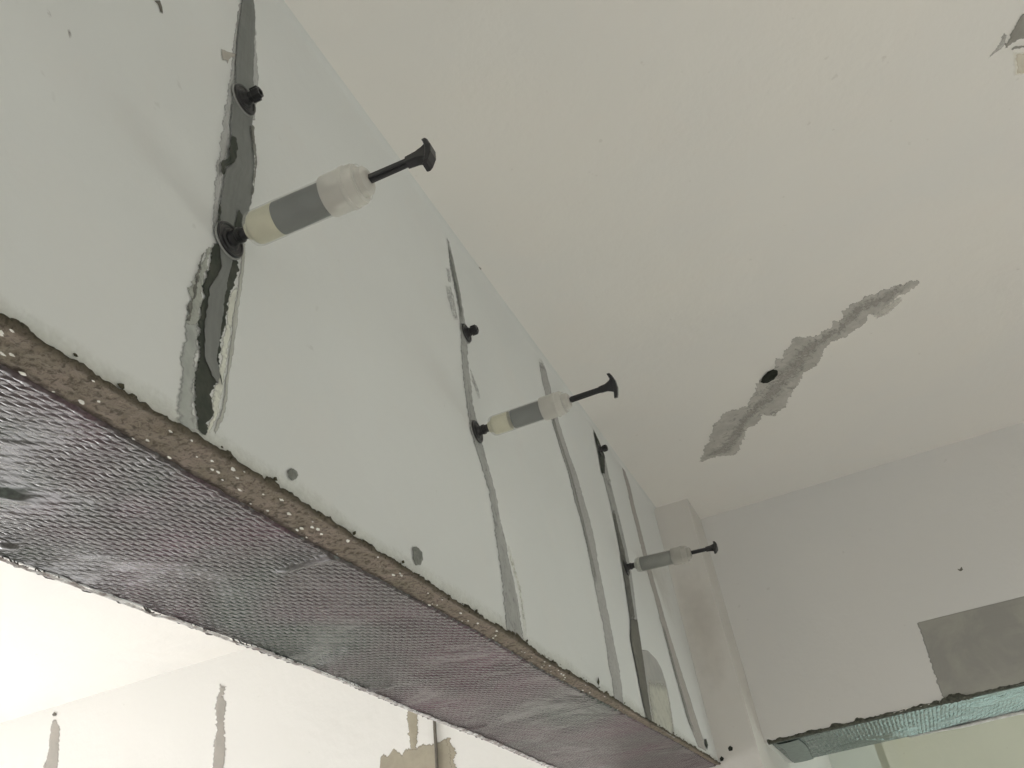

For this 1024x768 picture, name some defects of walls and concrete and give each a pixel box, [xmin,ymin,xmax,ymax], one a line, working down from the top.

crack [177,0,259,435]
peeling [989,14,1024,58]
spalling [0,313,721,768]
crack [448,242,523,639]
crack [540,363,708,750]